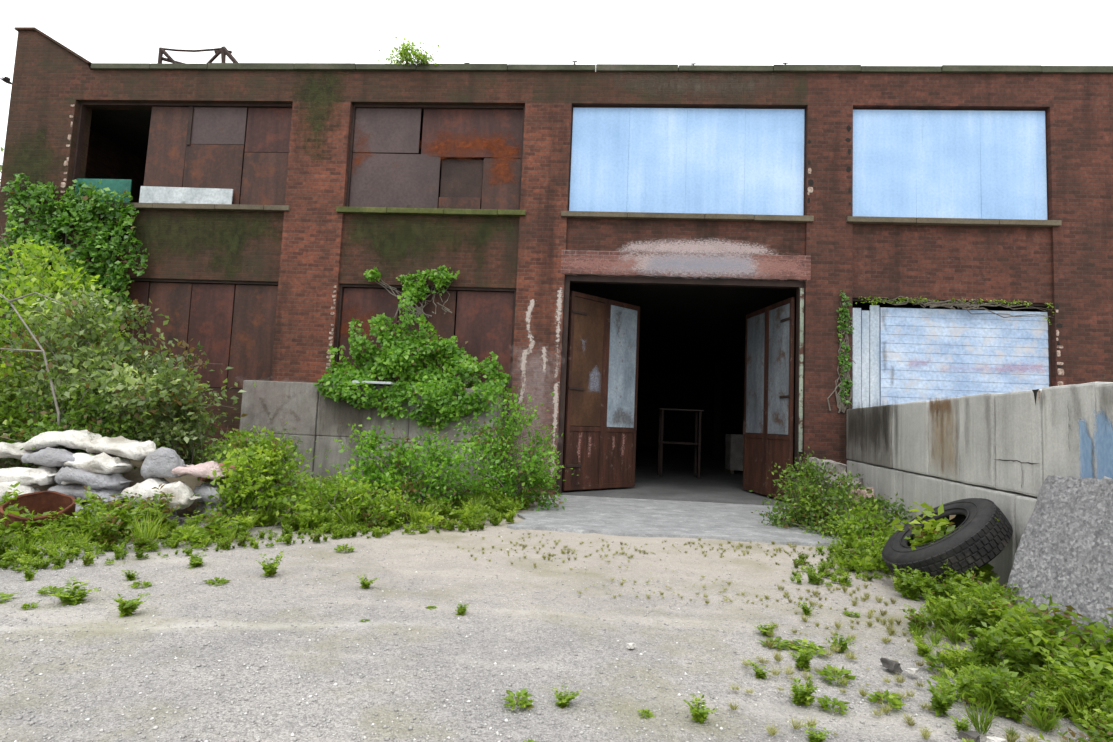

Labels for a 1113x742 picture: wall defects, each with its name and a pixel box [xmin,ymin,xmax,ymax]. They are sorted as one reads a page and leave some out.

peeling [566,238,805,279]
water stain [518,299,546,403]
rust [930,401,950,430]
peeling [1079,420,1093,479]